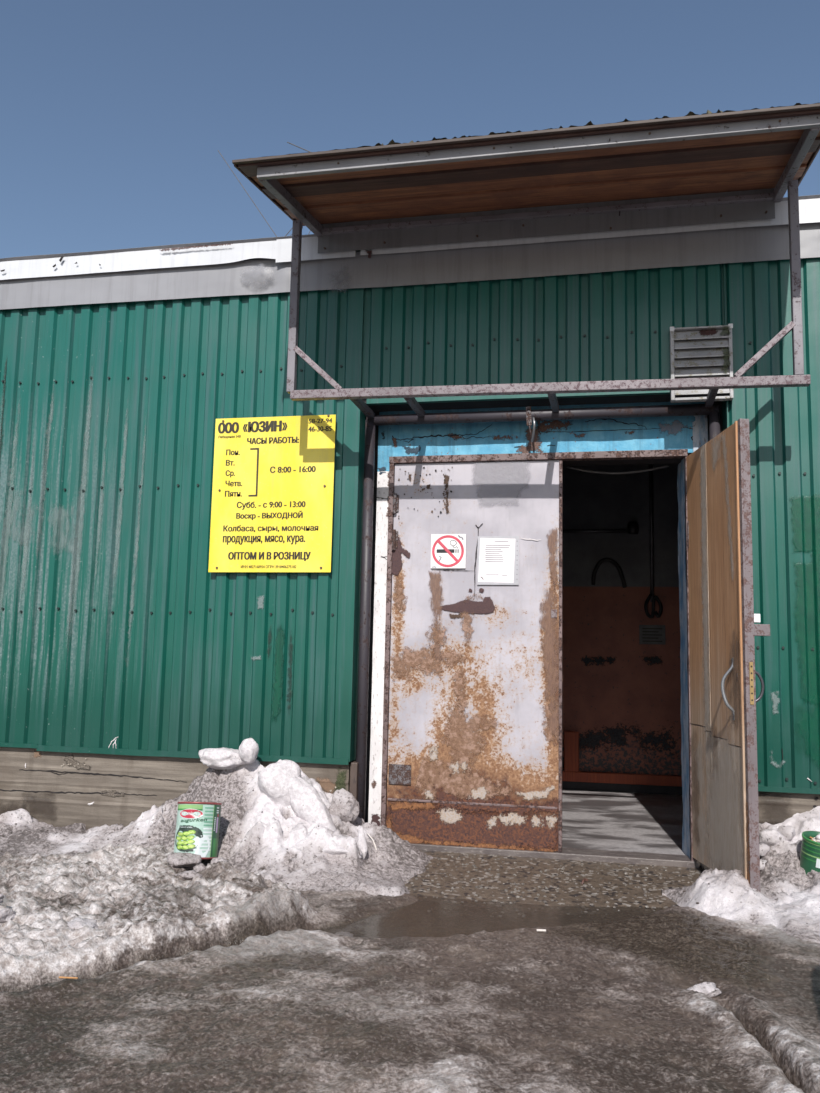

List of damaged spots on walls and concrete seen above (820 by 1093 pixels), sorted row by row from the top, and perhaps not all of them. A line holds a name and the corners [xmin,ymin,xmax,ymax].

rust [514,426,555,453]
rust [392,537,410,613]
rust [386,624,559,852]
rust [539,528,559,745]
damp [791,495,820,765]